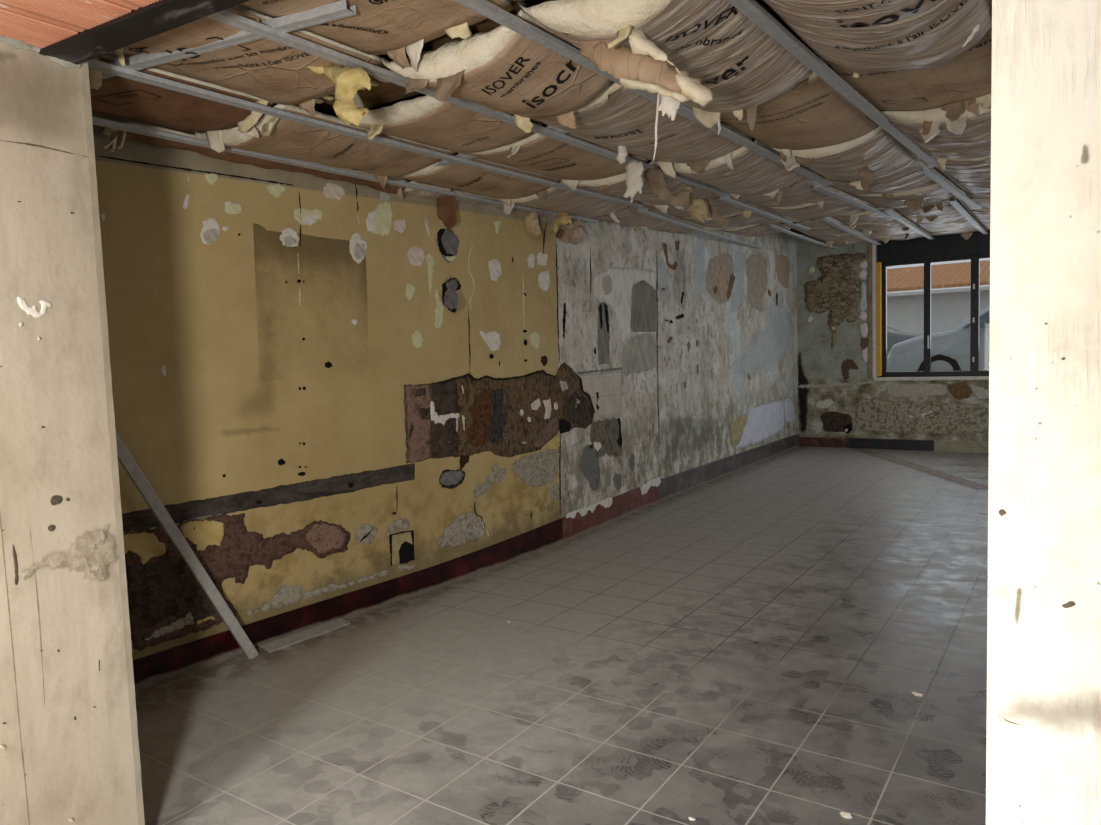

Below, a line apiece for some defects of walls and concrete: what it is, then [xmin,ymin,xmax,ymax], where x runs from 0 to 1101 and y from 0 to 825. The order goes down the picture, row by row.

peeling [266,183,286,198]
peeling [280,207,323,247]
peeling [349,192,406,264]
peeling [407,246,426,266]
peeling [488,257,514,281]
peeling [527,252,550,291]
spalling [594,280,673,376]
spalling [706,254,790,311]
spalling [804,253,867,350]
spalling [403,330,599,548]
peeling [565,497,613,518]
spalling [12,513,415,651]